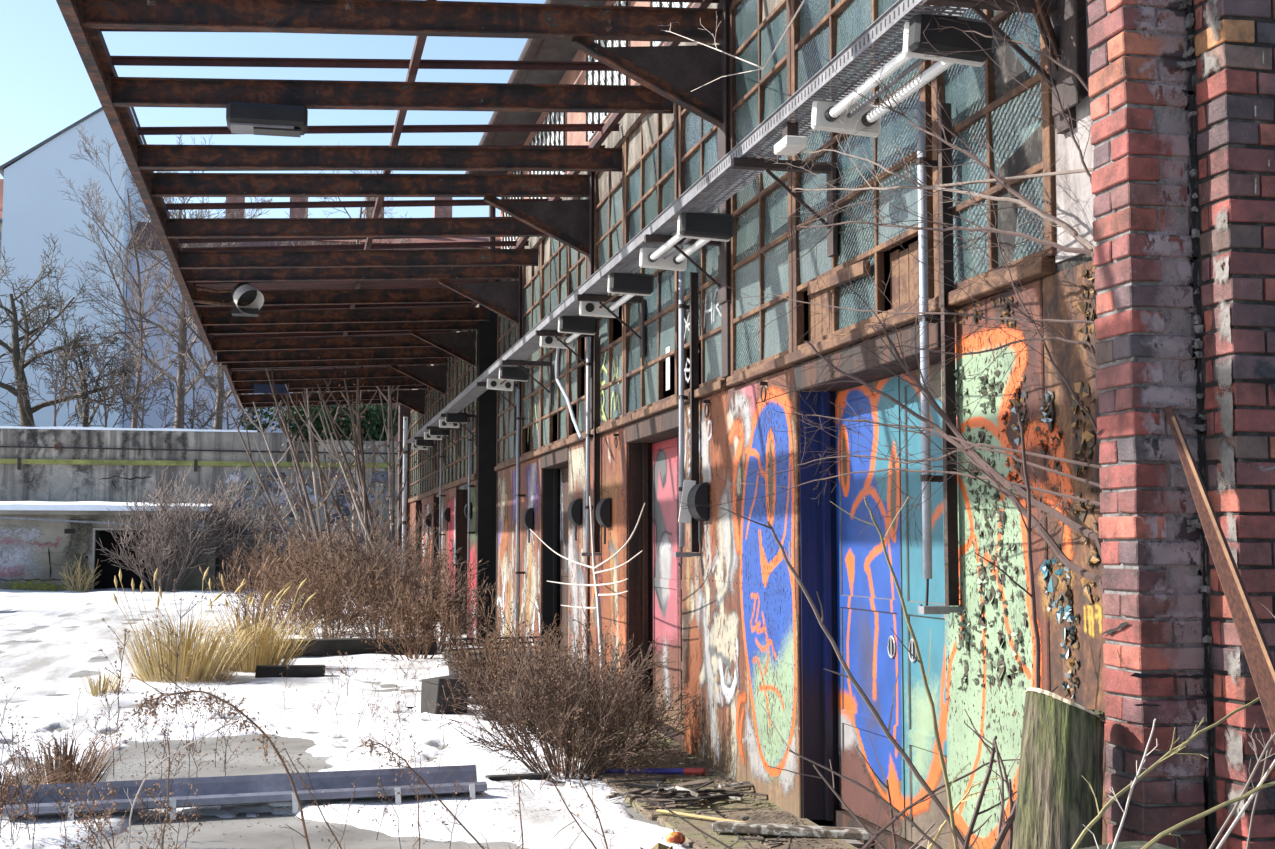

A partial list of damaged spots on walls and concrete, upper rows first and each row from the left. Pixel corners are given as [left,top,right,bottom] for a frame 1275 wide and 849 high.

peeling [1077,269,1096,348]
damp [17,429,104,487]
damp [112,431,187,489]
peeling [953,364,1100,699]